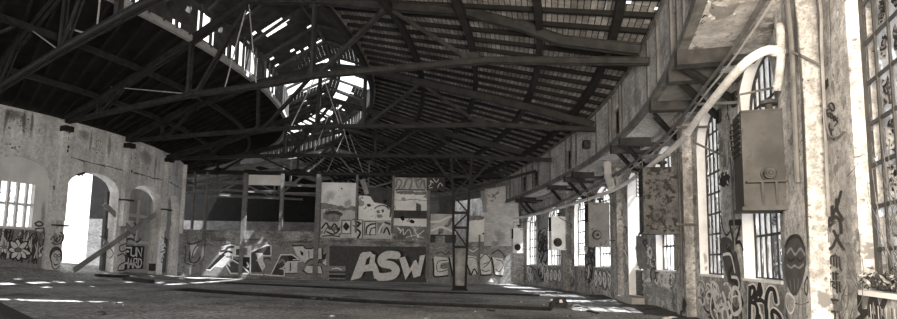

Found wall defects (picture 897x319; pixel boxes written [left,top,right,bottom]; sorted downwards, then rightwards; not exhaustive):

crack [71,157,179,187]